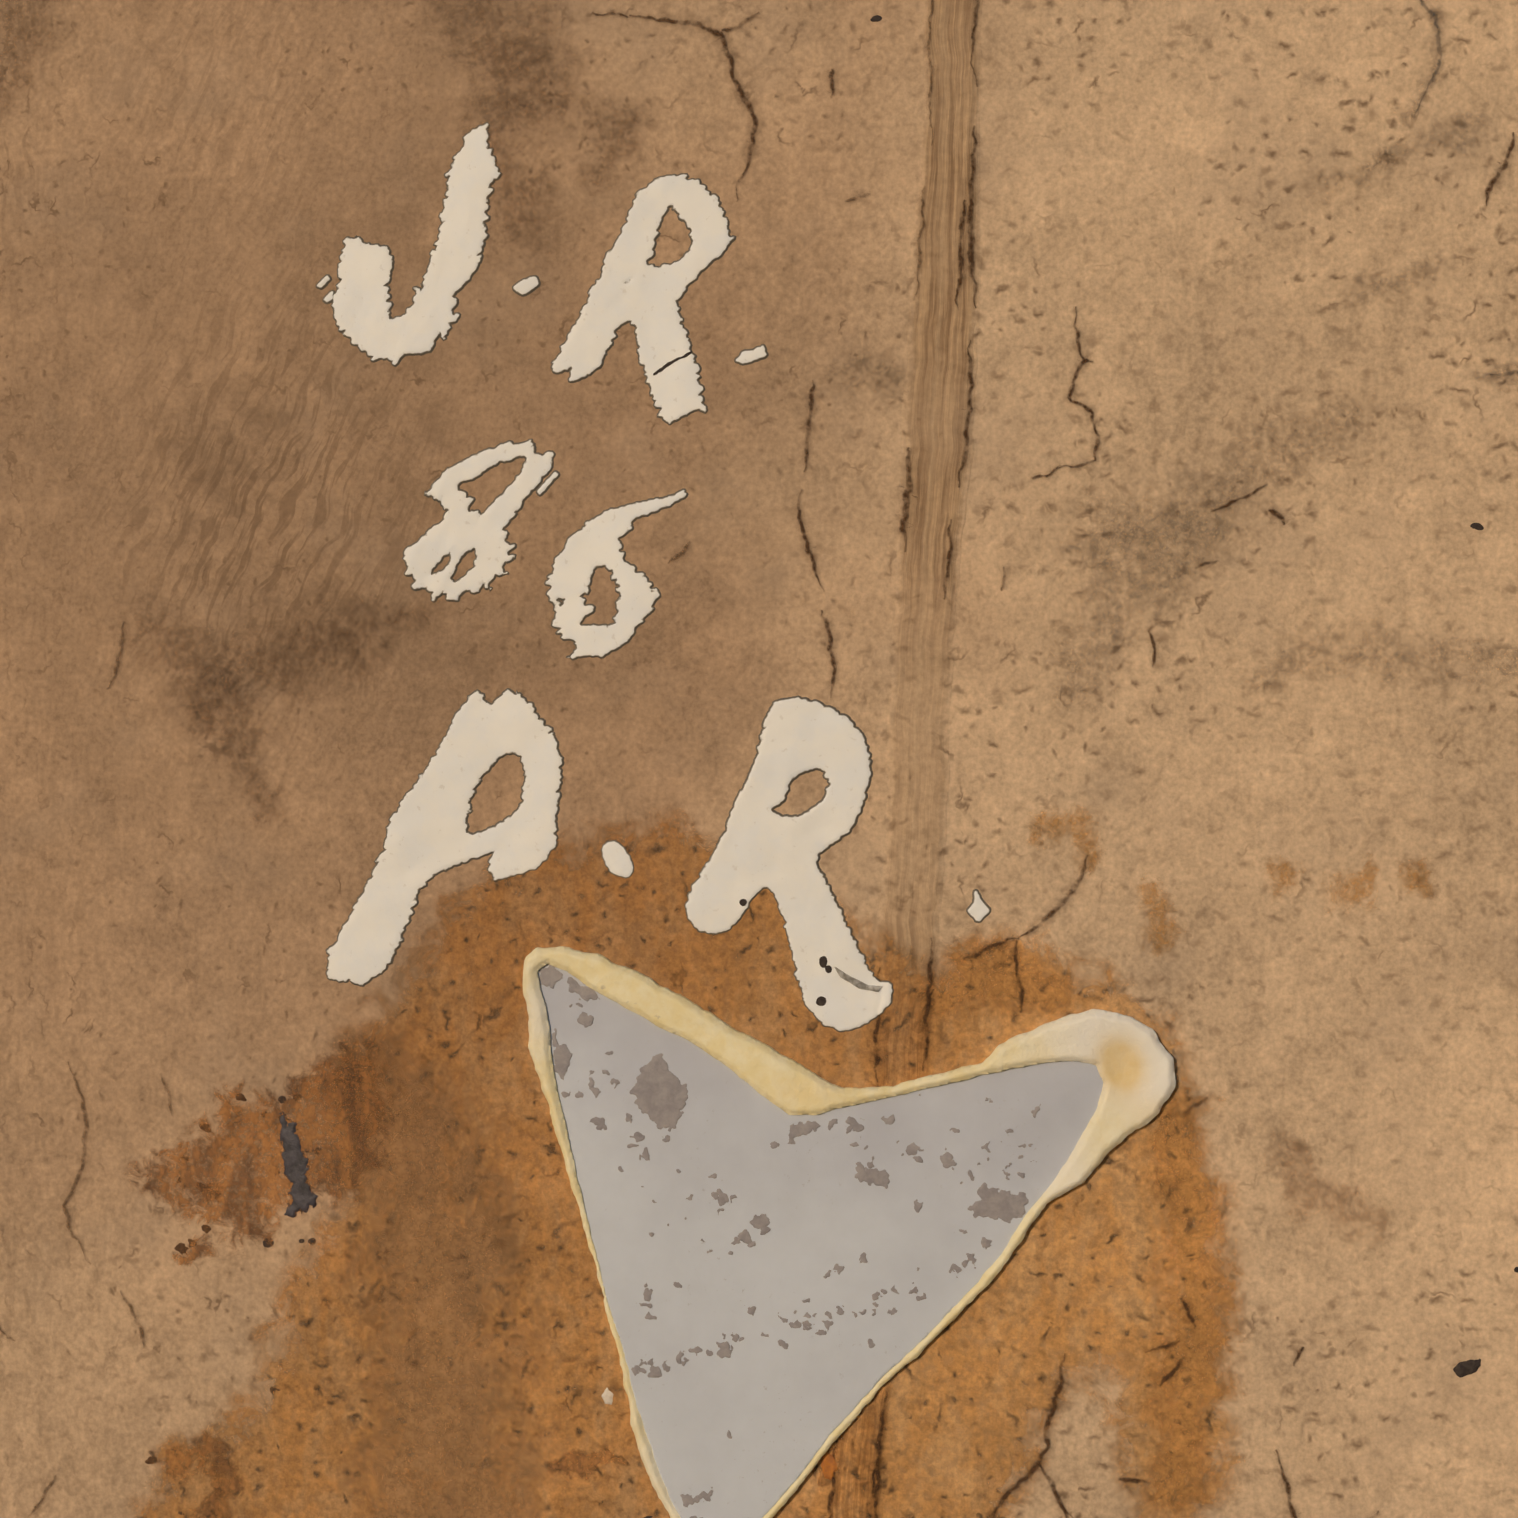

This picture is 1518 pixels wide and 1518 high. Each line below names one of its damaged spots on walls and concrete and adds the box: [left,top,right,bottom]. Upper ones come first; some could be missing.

crack [593,12,759,199]
crack [916,128,977,599]
crack [1033,306,1099,478]
crack [797,508,836,684]
peeling [539,965,600,1028]
crack [922,855,1088,1070]
peeling [552,1028,688,1161]
corrosion [135,820,1239,1518]
peeling [701,1214,771,1255]
peeling [770,1116,890,1189]
peeling [881,1114,1037,1278]
peeling [631,1267,926,1378]